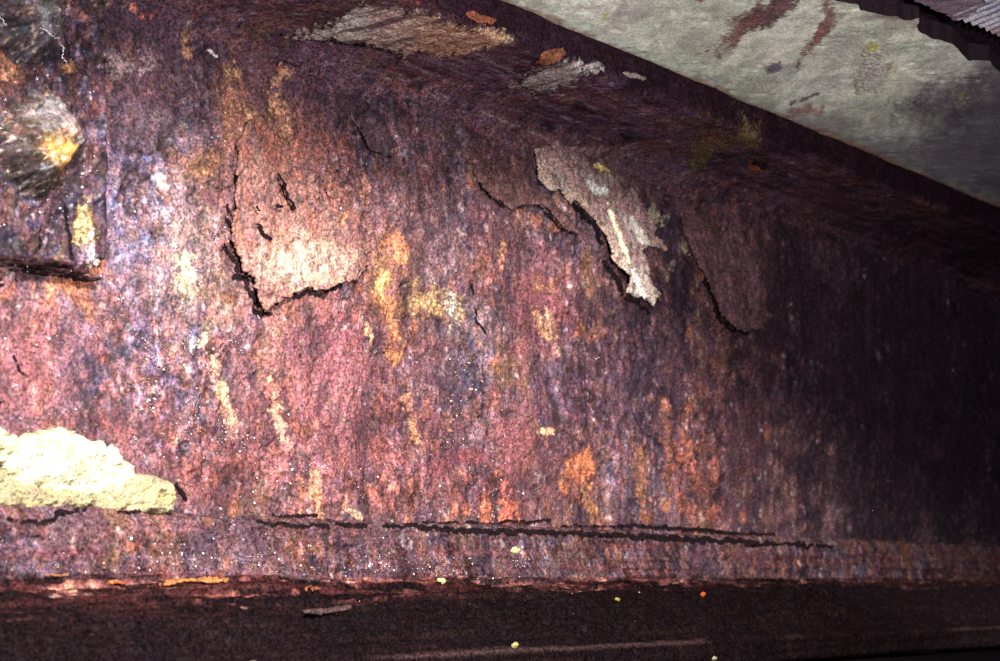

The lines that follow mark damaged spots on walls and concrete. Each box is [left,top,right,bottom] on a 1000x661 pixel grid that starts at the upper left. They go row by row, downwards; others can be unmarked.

peeling [283,1,514,63]
rust [697,0,800,59]
peeling [508,58,604,94]
crack [224,169,342,317]
rust [188,60,466,384]
rust [453,140,668,306]
crack [476,172,651,315]
rust [0,255,108,325]
crack [470,283,486,333]
crack [703,280,757,335]
rust [264,374,292,450]
rust [554,445,607,524]